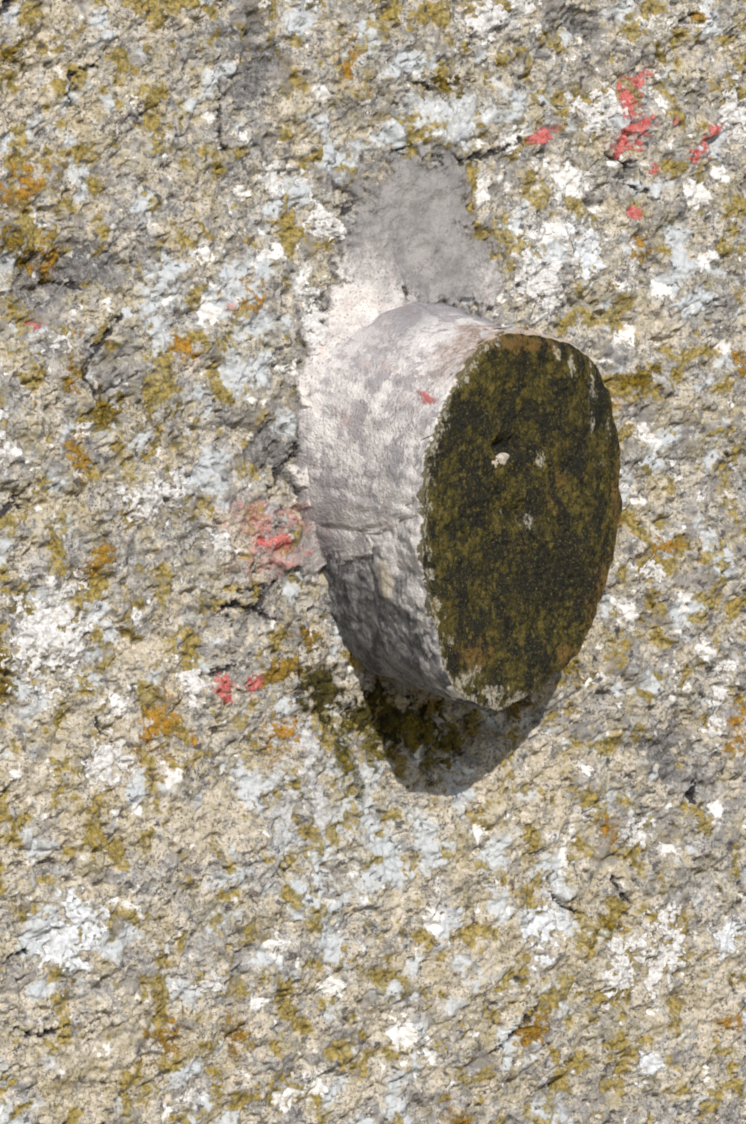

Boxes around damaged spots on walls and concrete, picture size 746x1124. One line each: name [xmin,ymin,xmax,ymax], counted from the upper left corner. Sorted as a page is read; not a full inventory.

crack [214,82,226,151]
crack [81,313,134,396]
water stain [258,623,480,868]